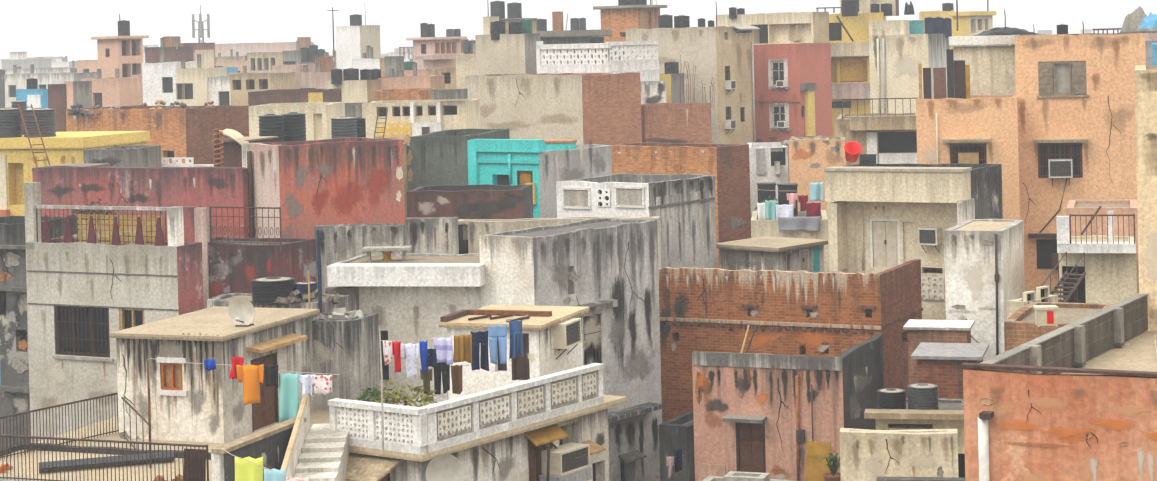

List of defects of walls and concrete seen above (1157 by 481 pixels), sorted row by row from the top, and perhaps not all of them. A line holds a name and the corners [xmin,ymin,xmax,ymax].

crack [1106,96,1121,183]
damp [52,184,111,197]
damp [129,179,161,203]
spalling [0,252,20,282]
damp [541,178,840,367]
crack [776,378,789,452]
damp [697,353,878,426]